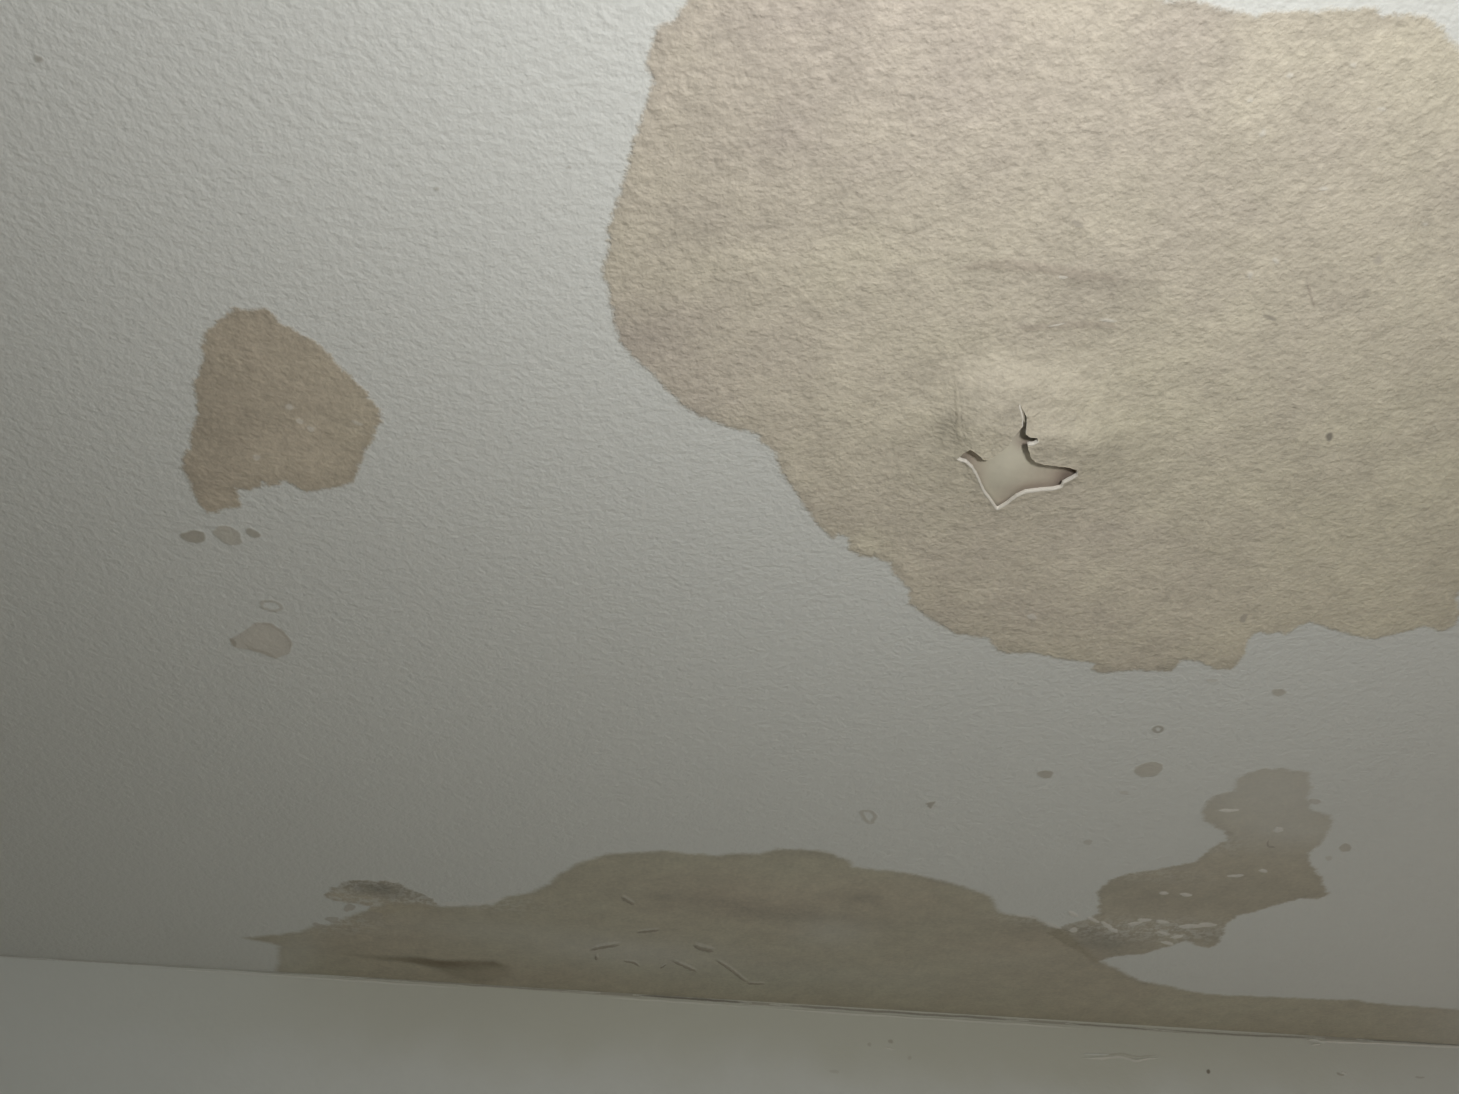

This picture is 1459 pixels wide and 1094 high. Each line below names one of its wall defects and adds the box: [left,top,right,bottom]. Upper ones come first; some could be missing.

damp [171,299,393,548]
damp [595,0,1459,684]
damp [226,597,297,660]
damp [233,760,1459,1045]